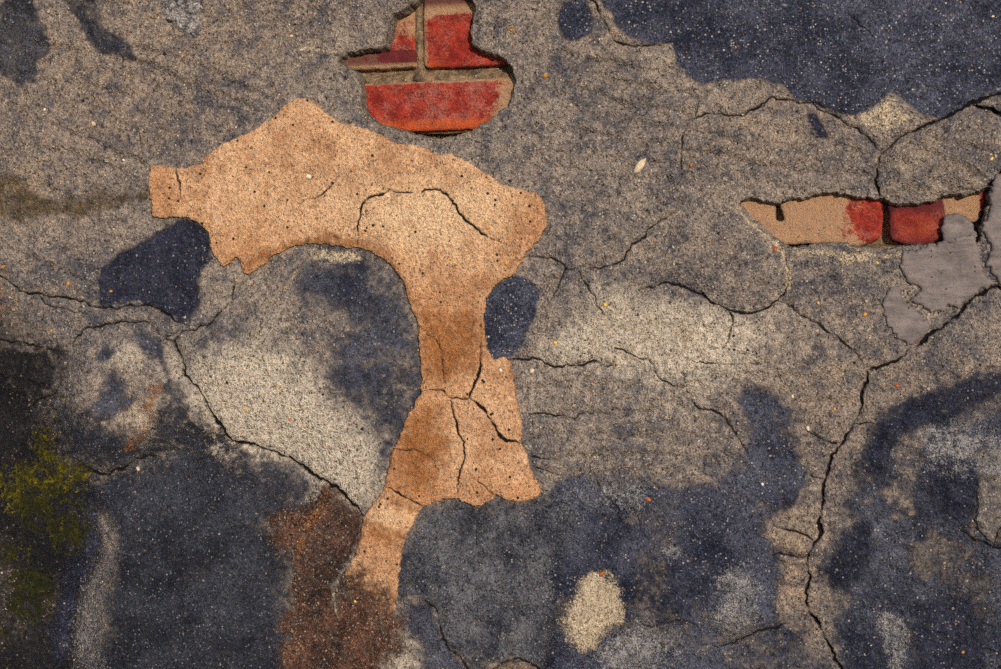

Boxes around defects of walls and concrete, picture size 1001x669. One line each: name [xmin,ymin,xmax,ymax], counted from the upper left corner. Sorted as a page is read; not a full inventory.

spalling [335,0,518,142]
damp [601,0,1001,138]
damp [98,220,210,322]
spalling [736,185,992,252]
damp [0,320,314,669]
crack [0,275,363,554]
corrosion [265,486,408,669]
peeling [344,485,423,621]
crack [421,333,559,494]
peeling [451,340,542,507]
damp [398,371,1001,669]
crack [638,267,1001,669]